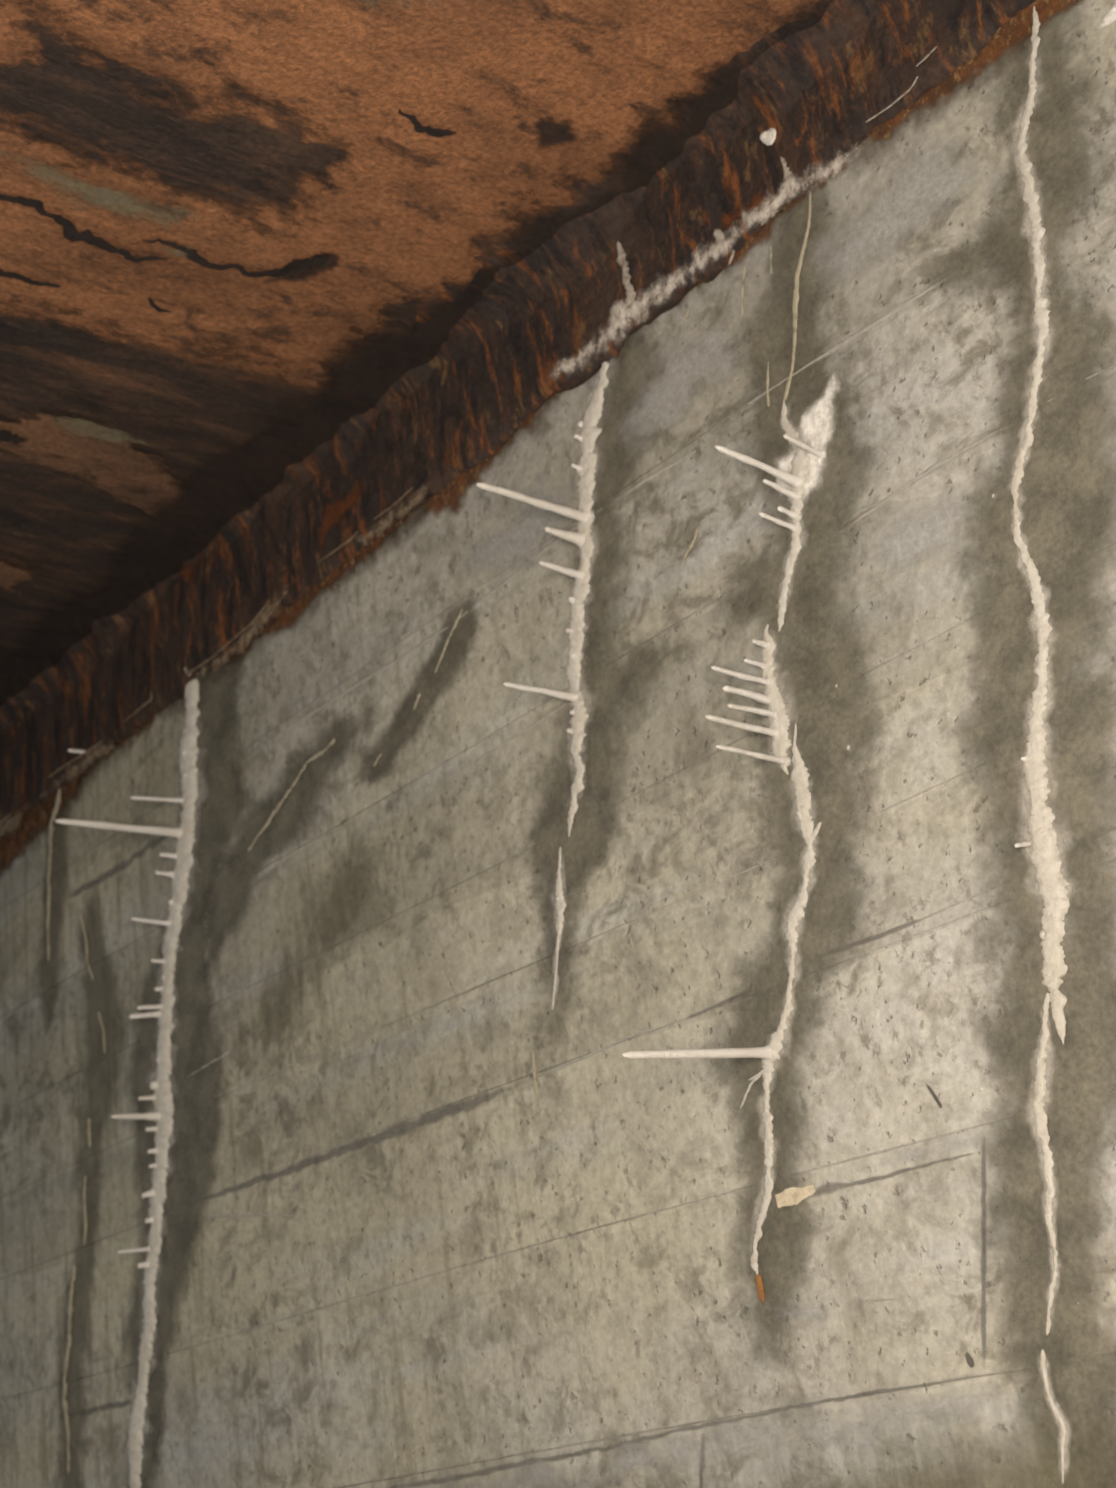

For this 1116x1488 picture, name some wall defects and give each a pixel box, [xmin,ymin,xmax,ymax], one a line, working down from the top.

corrosion [0,712,155,871]
corrosion [0,414,182,517]
crack [47,679,203,1488]
corrosion [220,389,564,664]
corrosion [0,0,820,391]
damp [0,0,835,706]
damp [361,602,476,781]
crack [476,362,609,1010]
crack [622,192,826,1303]
damp [532,128,967,1349]
damp [857,6,1116,1488]
crack [1011,6,1070,1484]